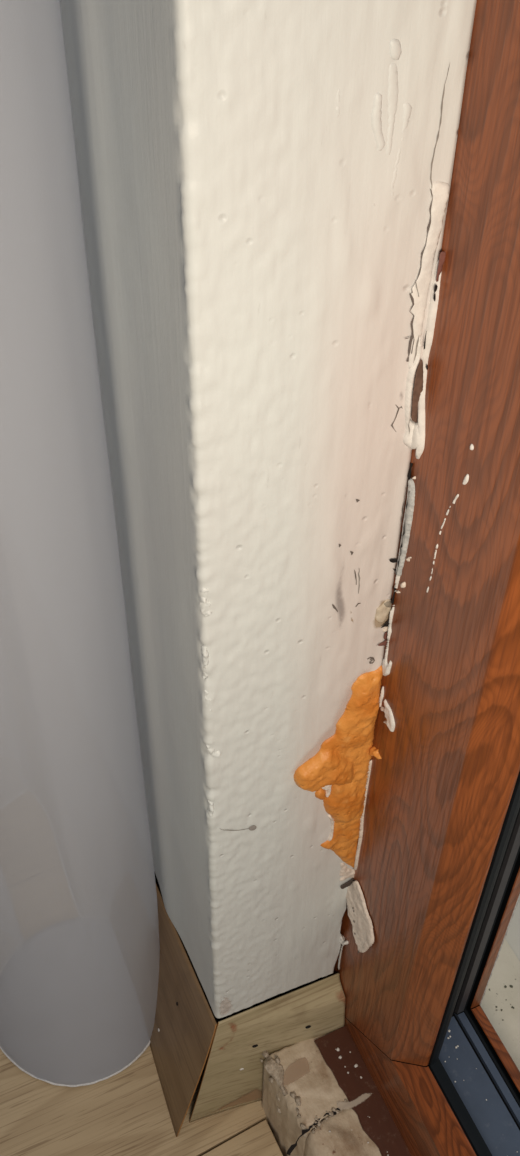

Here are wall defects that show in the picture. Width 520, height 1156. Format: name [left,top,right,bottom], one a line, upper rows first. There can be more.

crack [405,65,450,362]
crack [287,1093,370,1155]